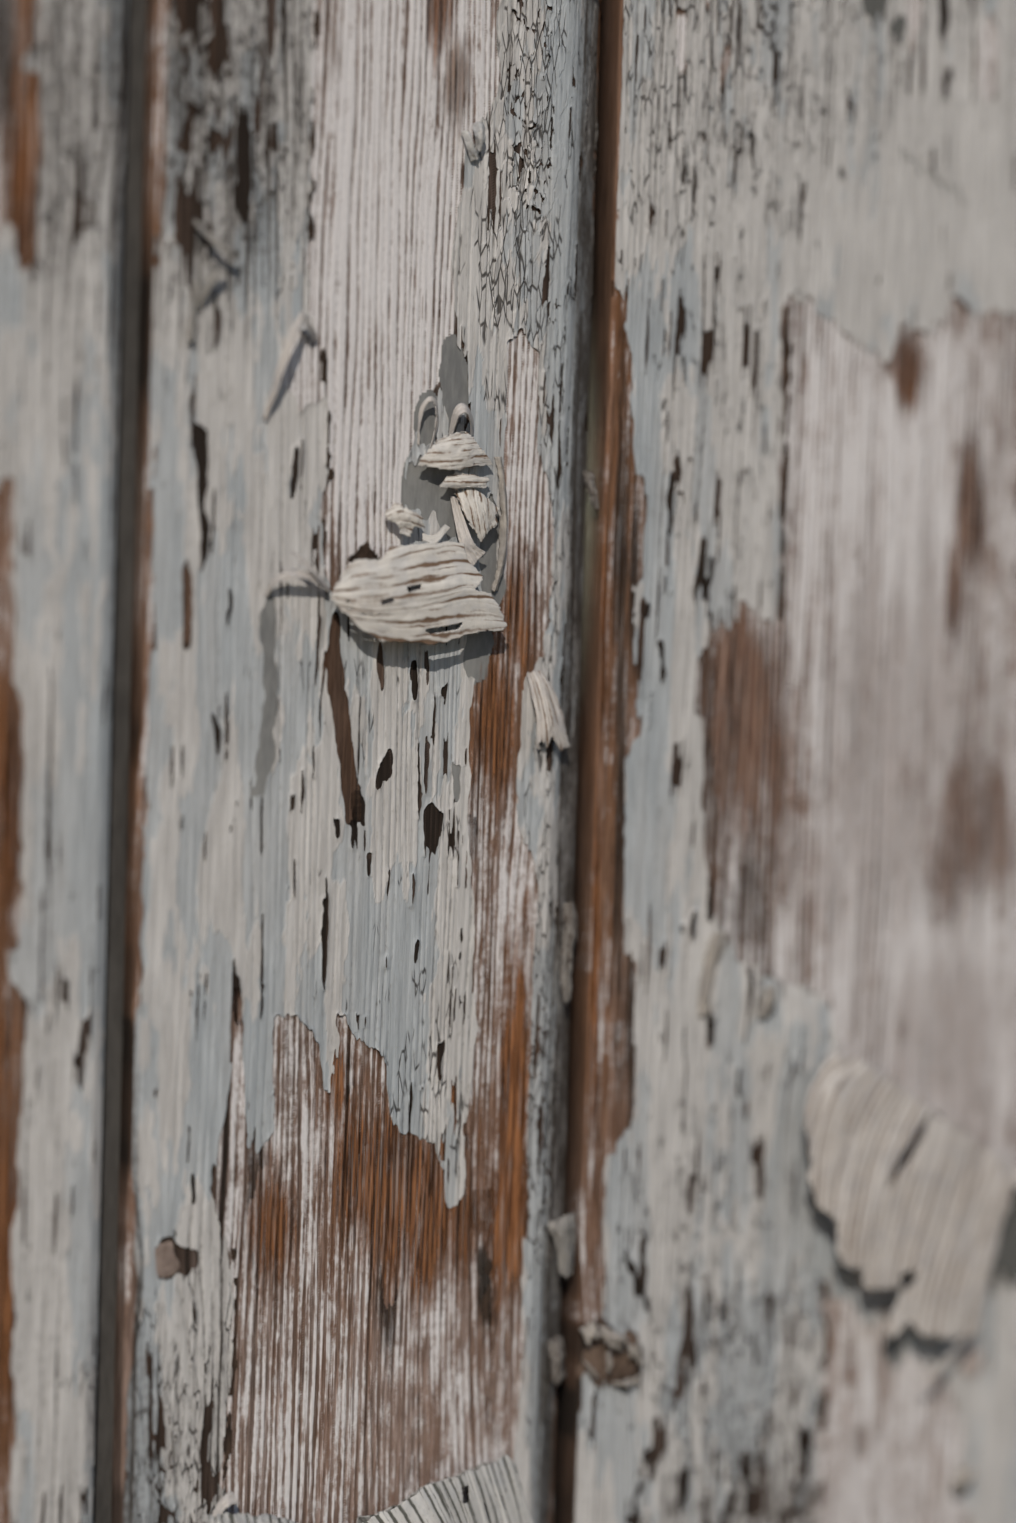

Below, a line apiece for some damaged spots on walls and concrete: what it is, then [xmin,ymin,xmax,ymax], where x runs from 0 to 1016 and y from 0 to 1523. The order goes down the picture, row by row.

peeling [0,0,128,1523]
peeling [121,0,600,1523]
peeling [574,0,1016,1523]